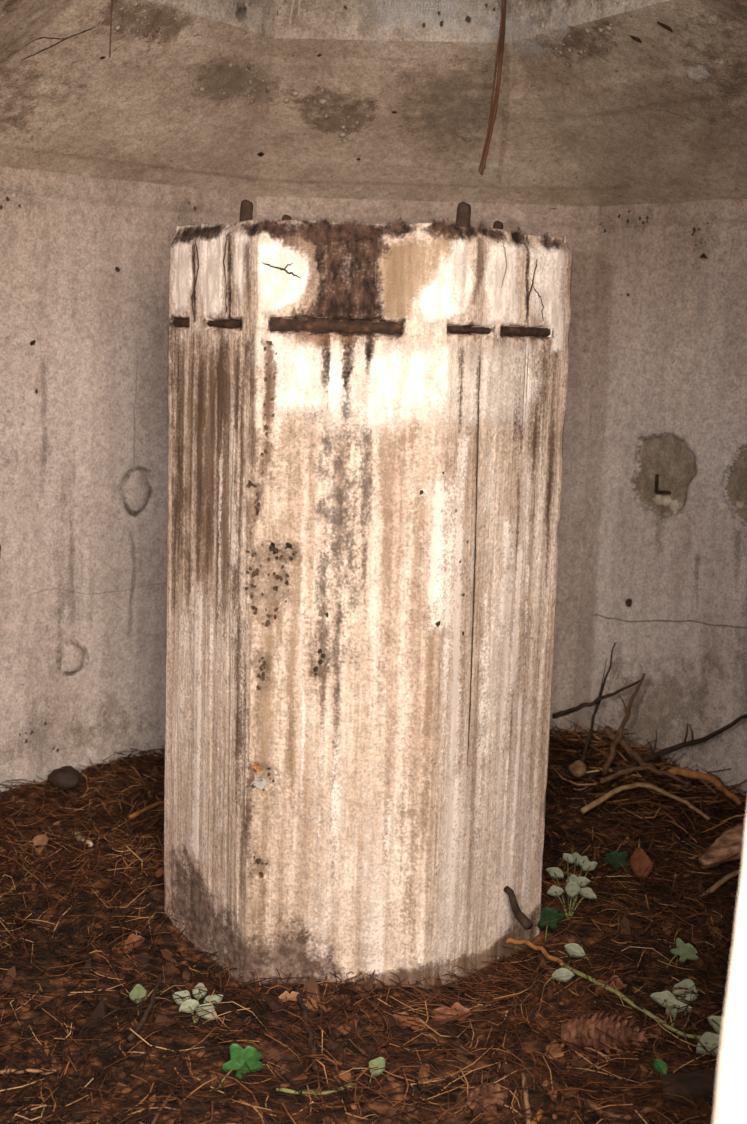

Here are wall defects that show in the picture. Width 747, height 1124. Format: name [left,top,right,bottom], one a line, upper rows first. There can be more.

water stain [97,224,565,990]
rust [268,230,450,337]